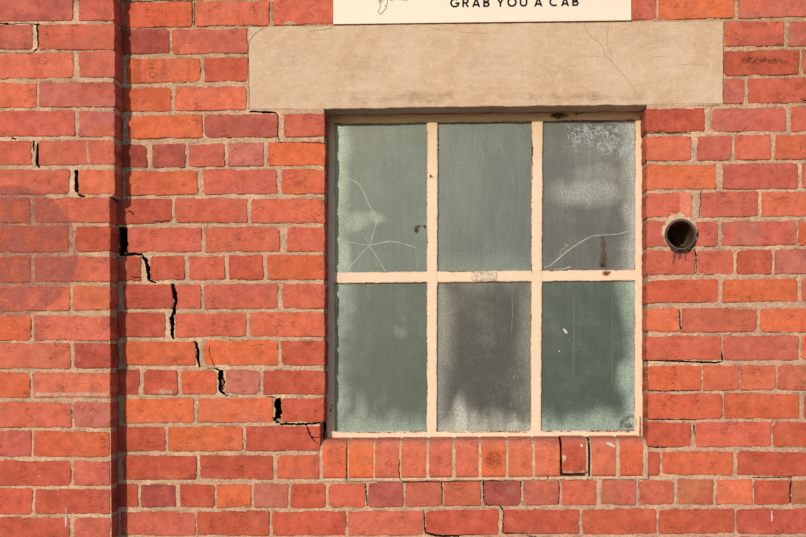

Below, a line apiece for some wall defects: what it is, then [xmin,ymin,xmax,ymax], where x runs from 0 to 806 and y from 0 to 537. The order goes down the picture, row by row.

crack [124,0,195,25]
crack [0,23,40,54]
crack [242,27,324,144]
crack [12,137,41,168]
crack [74,170,85,197]
crack [119,227,178,340]
crack [194,341,237,397]
crack [266,396,326,444]